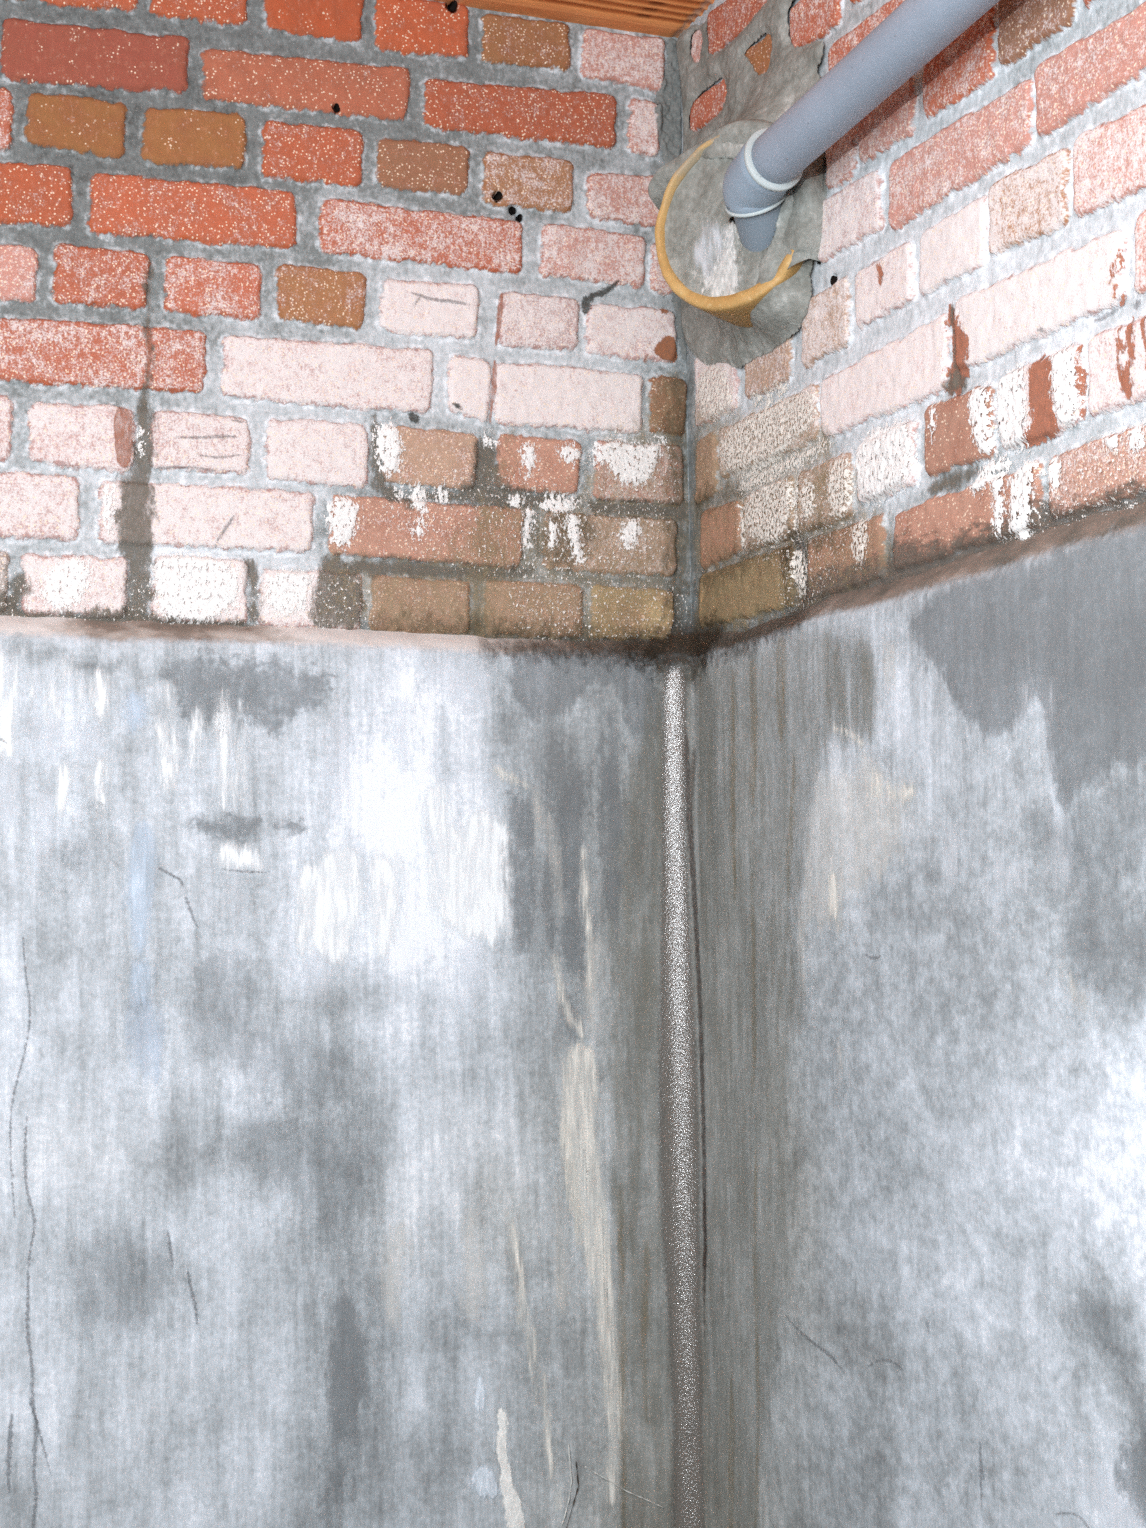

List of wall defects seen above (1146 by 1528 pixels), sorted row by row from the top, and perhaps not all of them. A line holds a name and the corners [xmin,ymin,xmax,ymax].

leakage [0,266,1146,734]
leakage [0,649,109,848]
leakage [129,658,330,875]
leakage [912,527,1146,872]
leakage [129,823,154,1004]
leakage [294,845,405,981]
leakage [421,768,533,964]
leakage [828,872,838,920]
leakage [554,715,622,1504]
leakage [511,1225,536,1367]
peeling [469,1376,525,1528]
leakage [544,1409,553,1476]